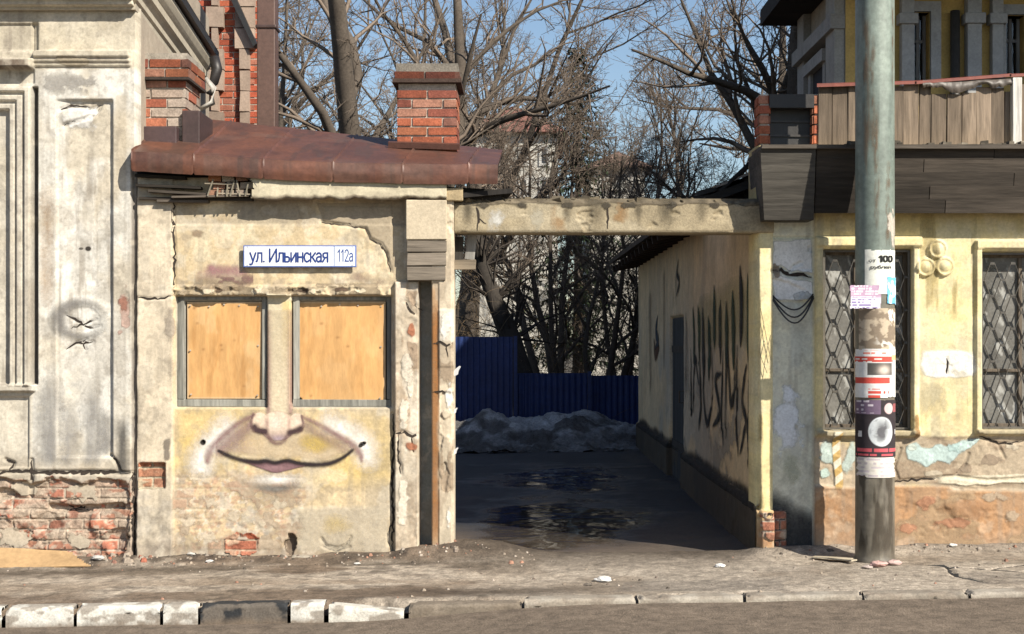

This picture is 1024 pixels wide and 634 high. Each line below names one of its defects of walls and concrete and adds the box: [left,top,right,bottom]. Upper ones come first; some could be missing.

peeling [62,107,99,128]
peeling [318,203,393,266]
crack [772,267,812,278]
crack [66,315,101,349]
peeling [440,312,453,347]
peeling [396,323,418,429]
peeling [440,362,454,417]
flaking render [0,462,410,556]
peeling [440,452,453,492]
flaking render [759,511,787,546]
peeling [819,429,855,487]
flaking render [895,437,1024,546]